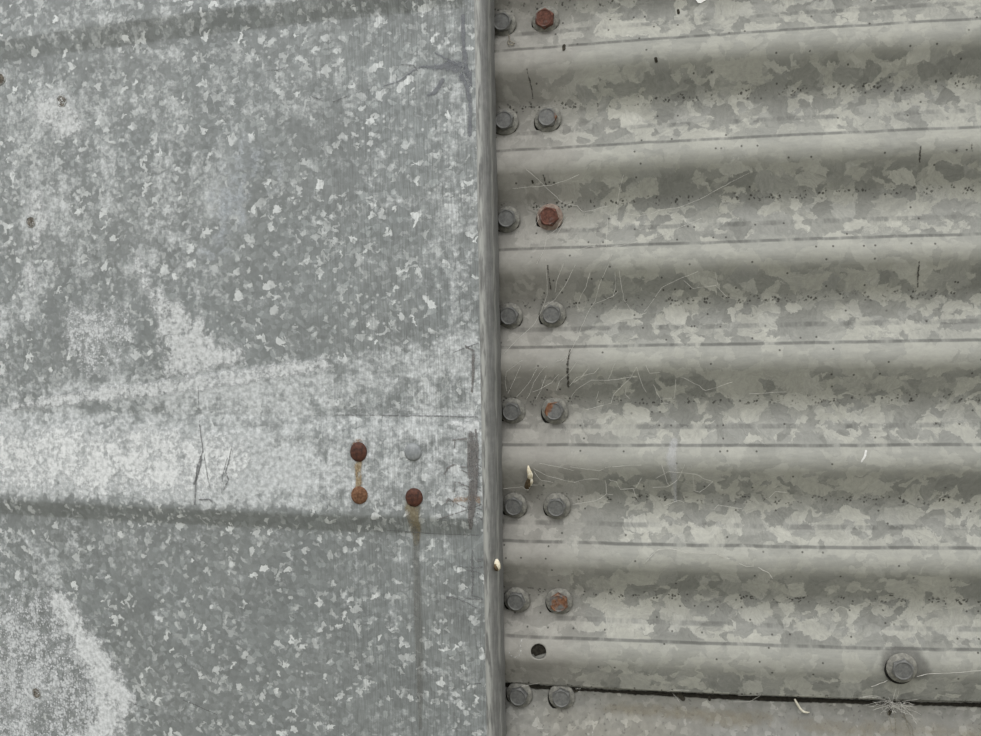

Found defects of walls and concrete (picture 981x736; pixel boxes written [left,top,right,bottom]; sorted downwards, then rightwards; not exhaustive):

rust [405,503,420,545]